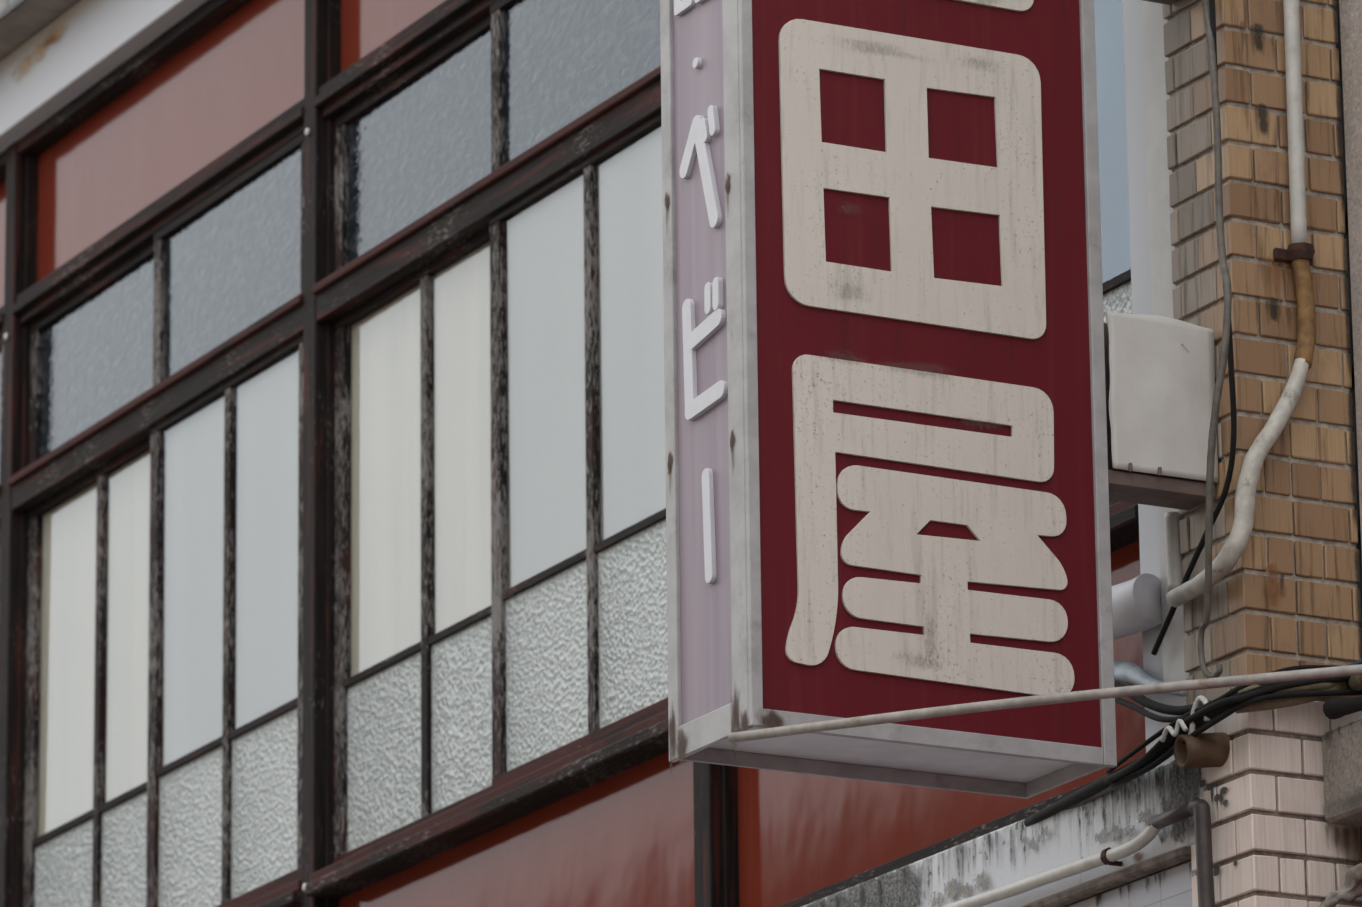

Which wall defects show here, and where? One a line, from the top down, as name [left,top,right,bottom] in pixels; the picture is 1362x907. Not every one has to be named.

water stain [1079,760,1201,842]
water stain [942,829,1025,867]
water stain [805,865,924,907]